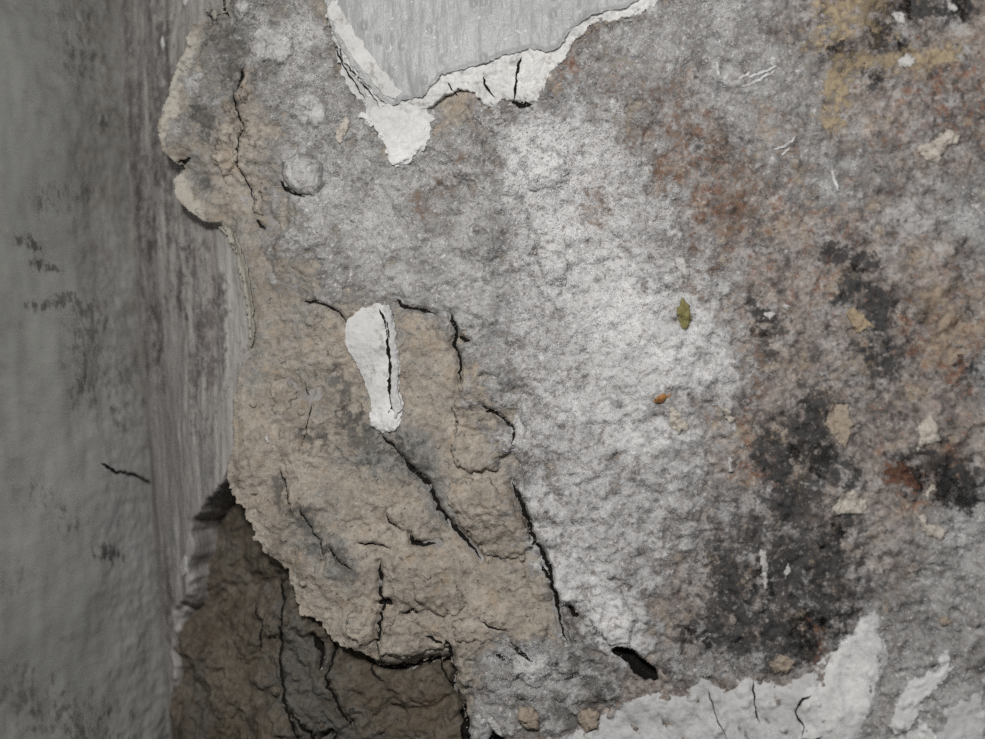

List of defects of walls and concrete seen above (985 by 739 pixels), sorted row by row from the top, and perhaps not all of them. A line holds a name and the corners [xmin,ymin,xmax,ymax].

water stain [900,0,977,26]
crack [233,68,266,229]
crack [304,300,347,323]
spalling [157,0,590,739]
crack [396,298,470,384]
crack [483,406,515,446]
water stain [155,0,902,739]
spalling [303,0,985,739]
crack [280,471,350,569]
crack [358,436,481,708]
crack [512,482,578,641]
water stain [759,441,985,739]